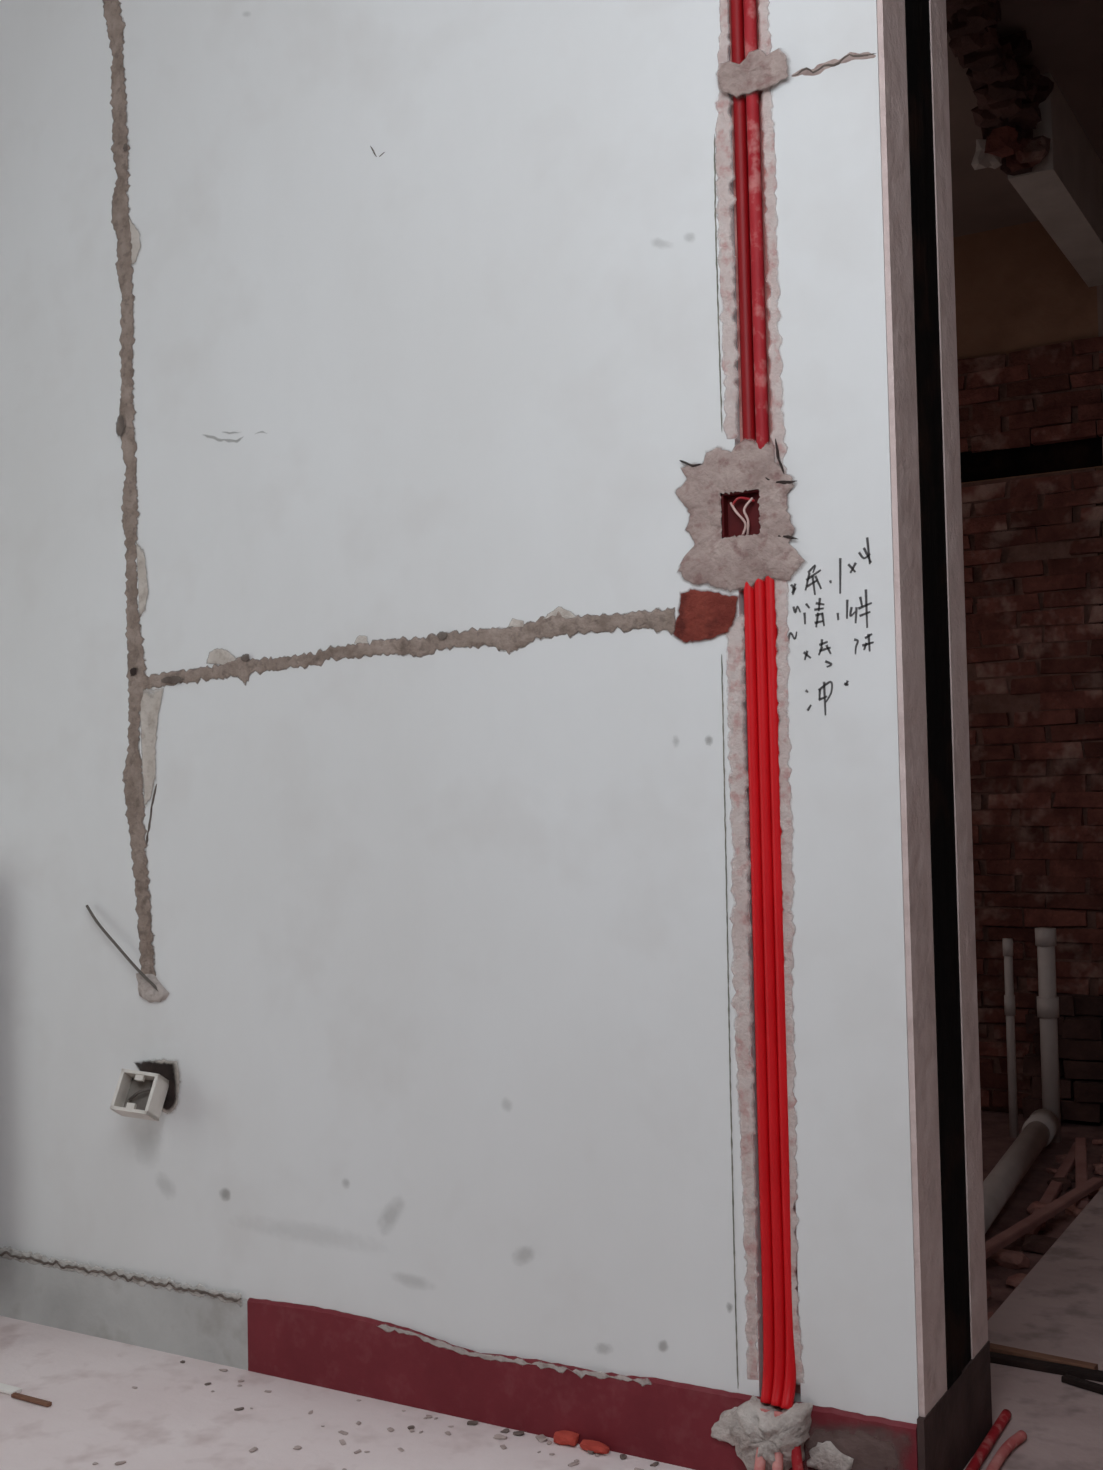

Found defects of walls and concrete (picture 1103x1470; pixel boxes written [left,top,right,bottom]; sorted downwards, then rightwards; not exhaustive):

crack [793,53,875,76]